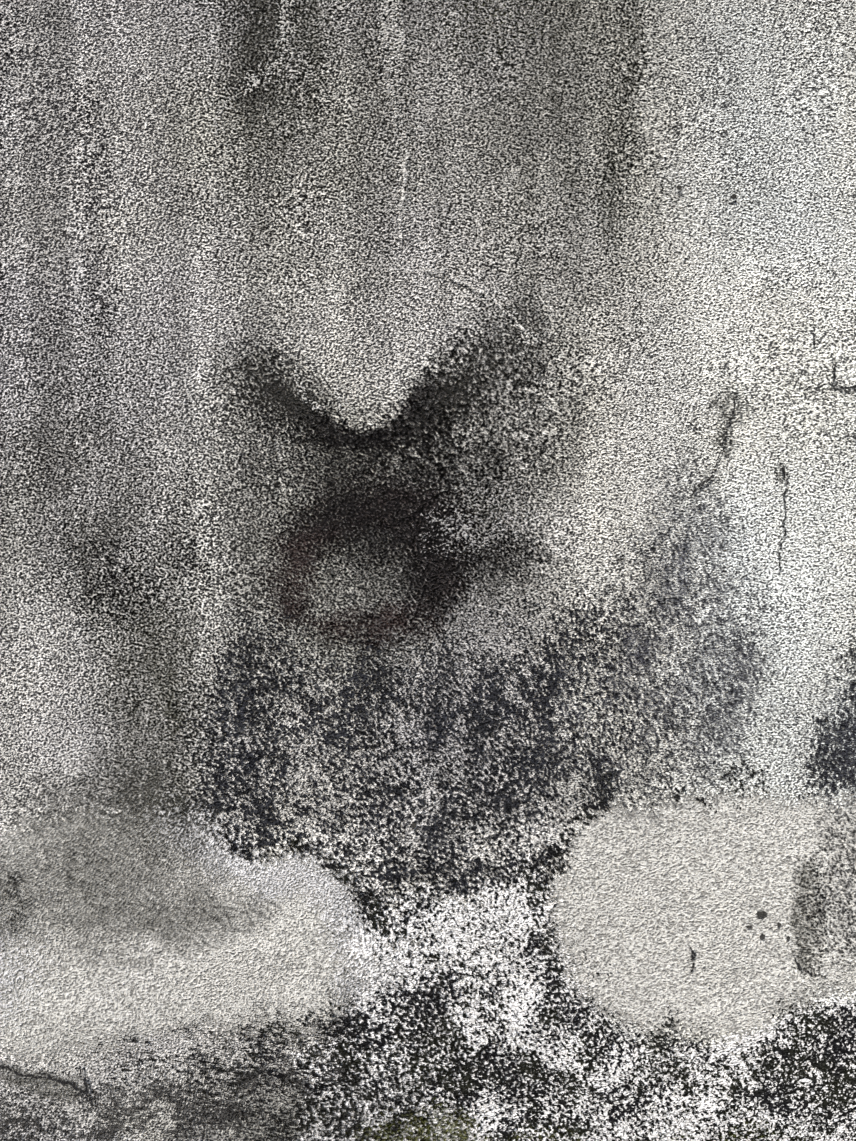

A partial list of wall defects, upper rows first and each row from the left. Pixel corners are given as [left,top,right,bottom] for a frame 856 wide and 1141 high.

leakage [709,383,754,457]
leakage [792,625,856,836]
crack [0,1061,95,1109]